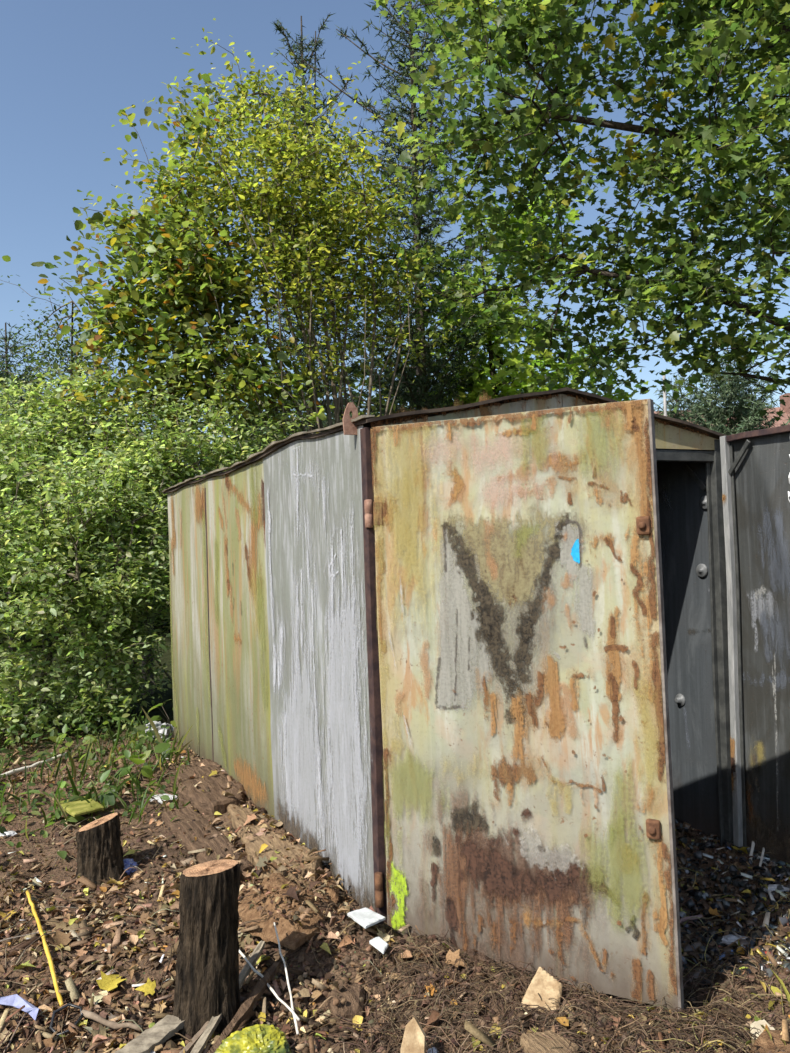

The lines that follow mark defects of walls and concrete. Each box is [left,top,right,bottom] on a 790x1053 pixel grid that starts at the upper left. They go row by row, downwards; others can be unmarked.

rust [195,485,205,524]
rust [219,474,262,621]
rust [370,394,708,813]
rust [383,748,396,928]
rust [631,839,677,1000]